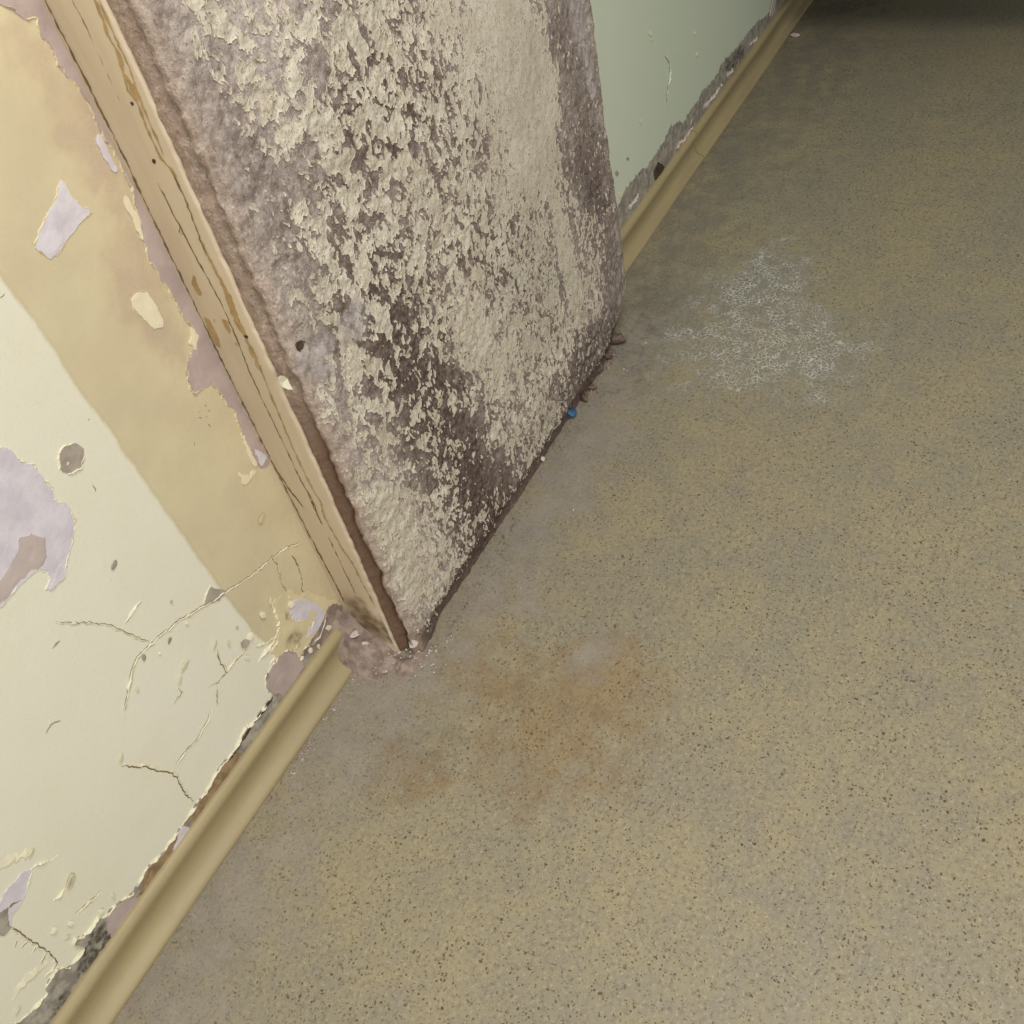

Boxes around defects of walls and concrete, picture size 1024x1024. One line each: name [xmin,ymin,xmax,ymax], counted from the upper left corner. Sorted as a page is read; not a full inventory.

damp [569,0,596,100]
peeling [0,0,270,485]
crack [45,0,376,709]
damp [297,339,333,379]
peeling [180,0,785,633]
peeling [0,447,77,608]
damp [353,606,393,643]
crack [122,632,253,801]
peeling [0,847,58,936]
peeling [14,590,343,1024]